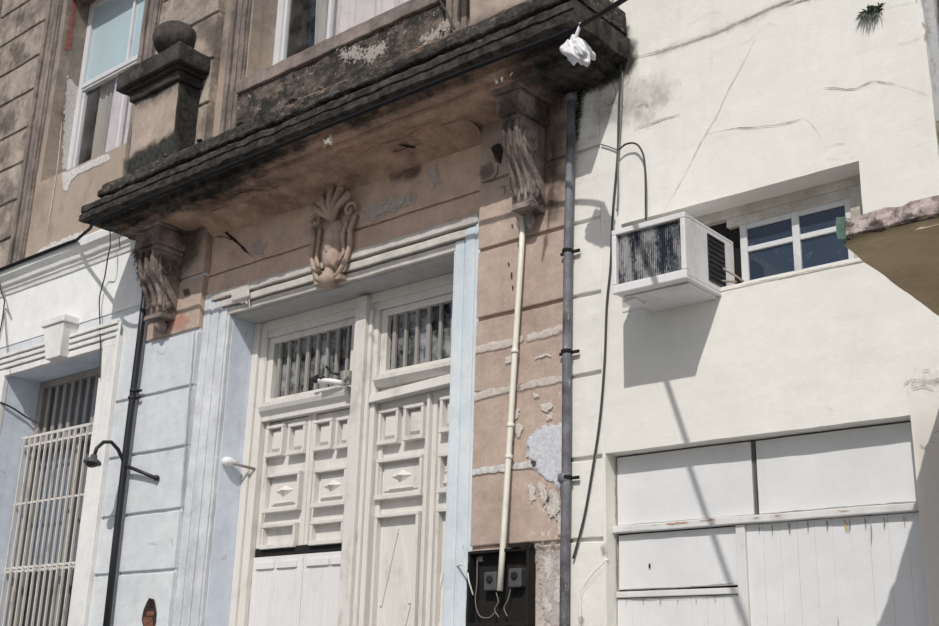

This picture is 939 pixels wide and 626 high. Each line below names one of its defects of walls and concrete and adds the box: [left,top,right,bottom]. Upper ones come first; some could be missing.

crack [636,0,815,163]
crack [832,80,928,94]
leakage [575,89,585,141]
crack [216,231,253,257]
peeling [526,324,563,341]
peeling [512,375,562,626]